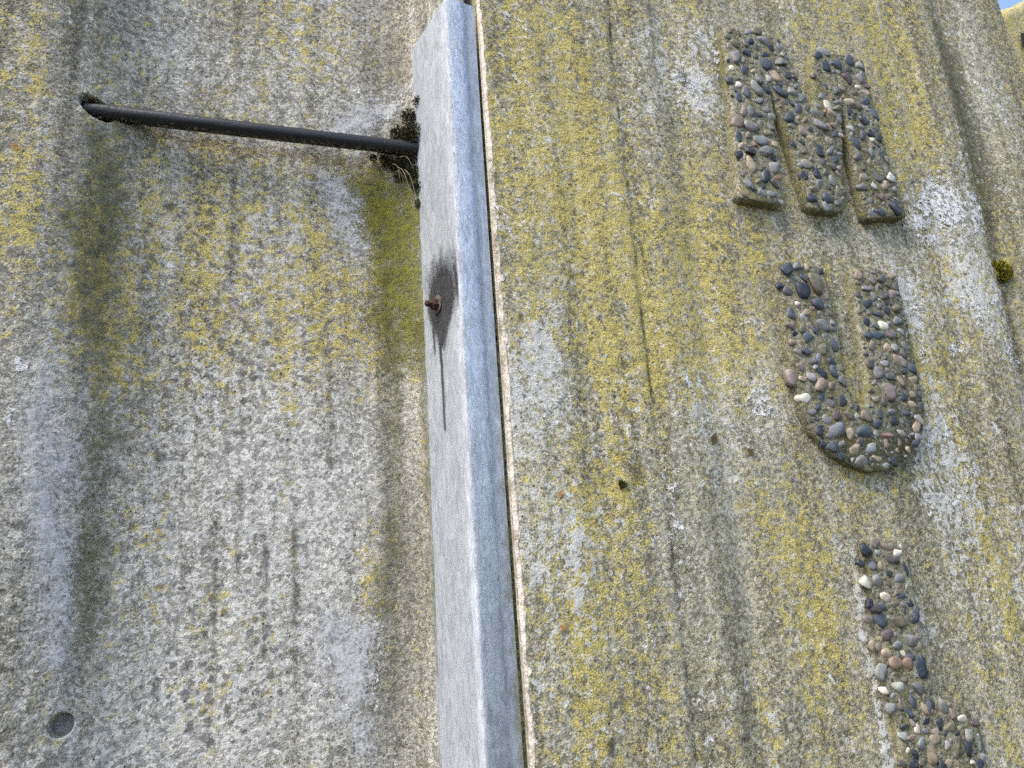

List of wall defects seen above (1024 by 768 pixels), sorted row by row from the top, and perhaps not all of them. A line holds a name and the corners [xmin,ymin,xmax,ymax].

damp [412,252,458,628]